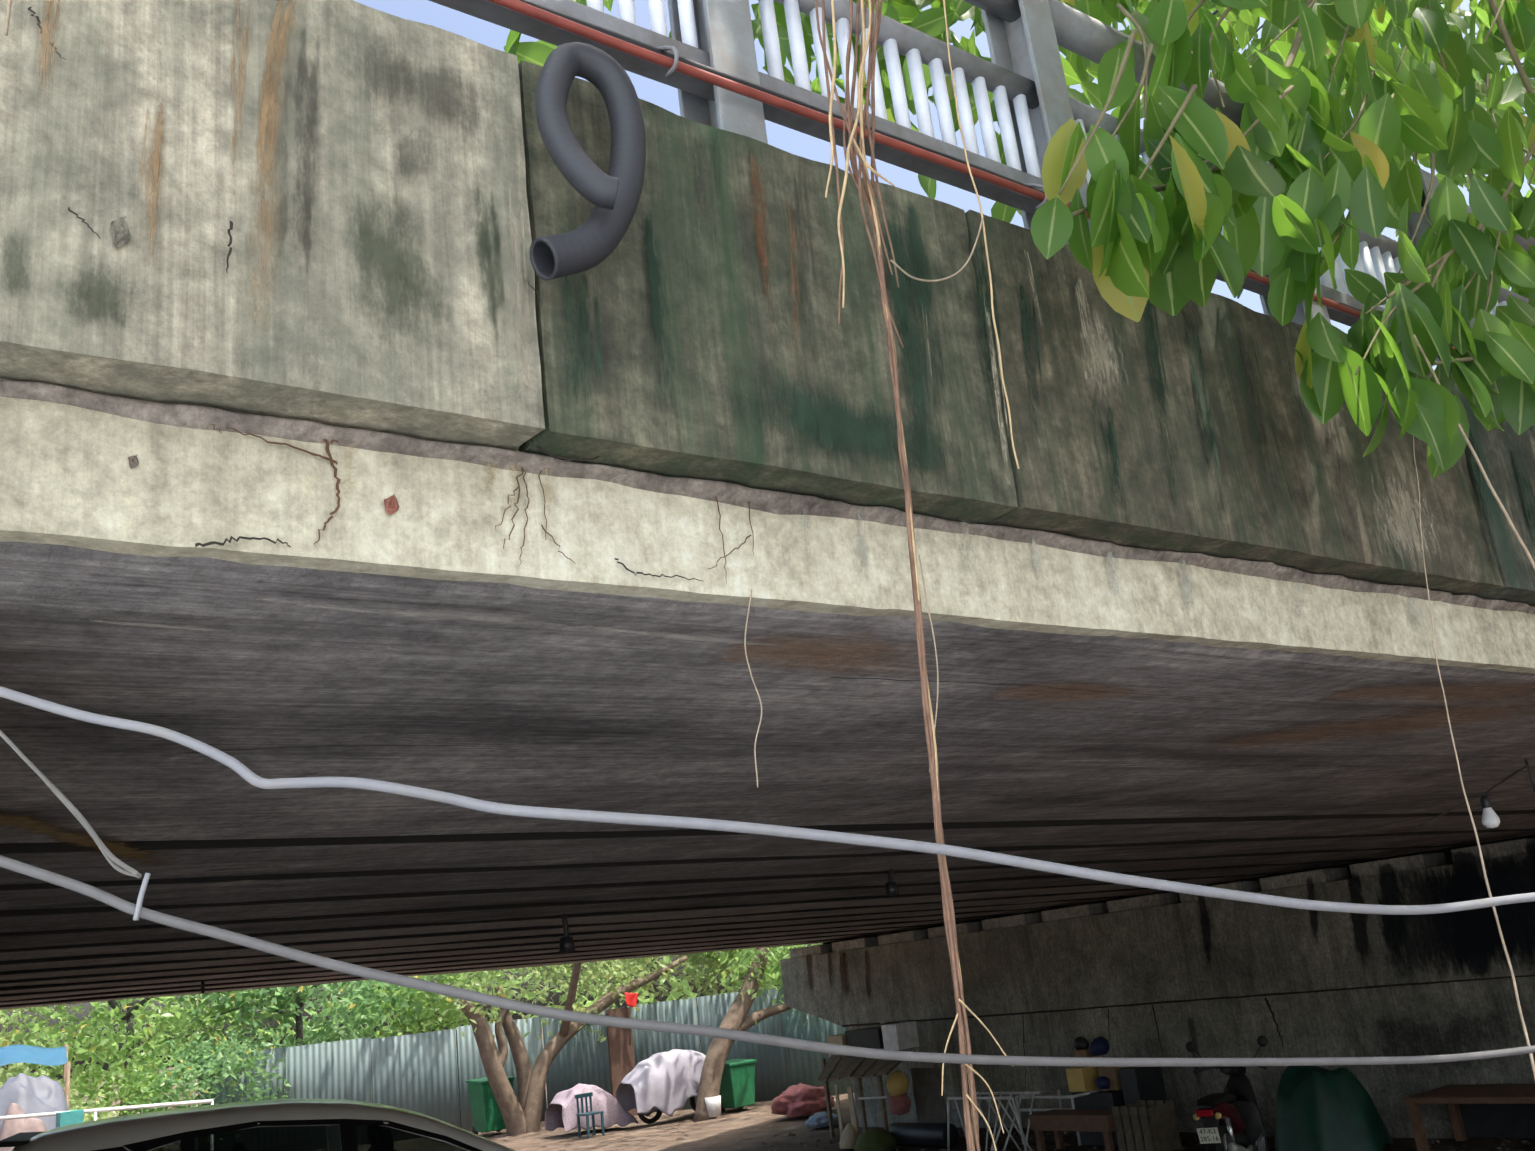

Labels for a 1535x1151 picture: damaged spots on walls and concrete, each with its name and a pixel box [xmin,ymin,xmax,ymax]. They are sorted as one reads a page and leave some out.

corrosion [40,0,60,82]
corrosion [231,0,294,170]
corrosion [141,104,163,243]
leakage [884,205,945,468]
leakage [973,243,1007,463]
leakage [1143,300,1167,430]
crack [195,424,341,548]
crack [495,438,600,566]
crack [614,496,754,585]
leakage [1198,896,1210,962]
leakage [1307,878,1317,936]
leakage [1348,843,1535,975]